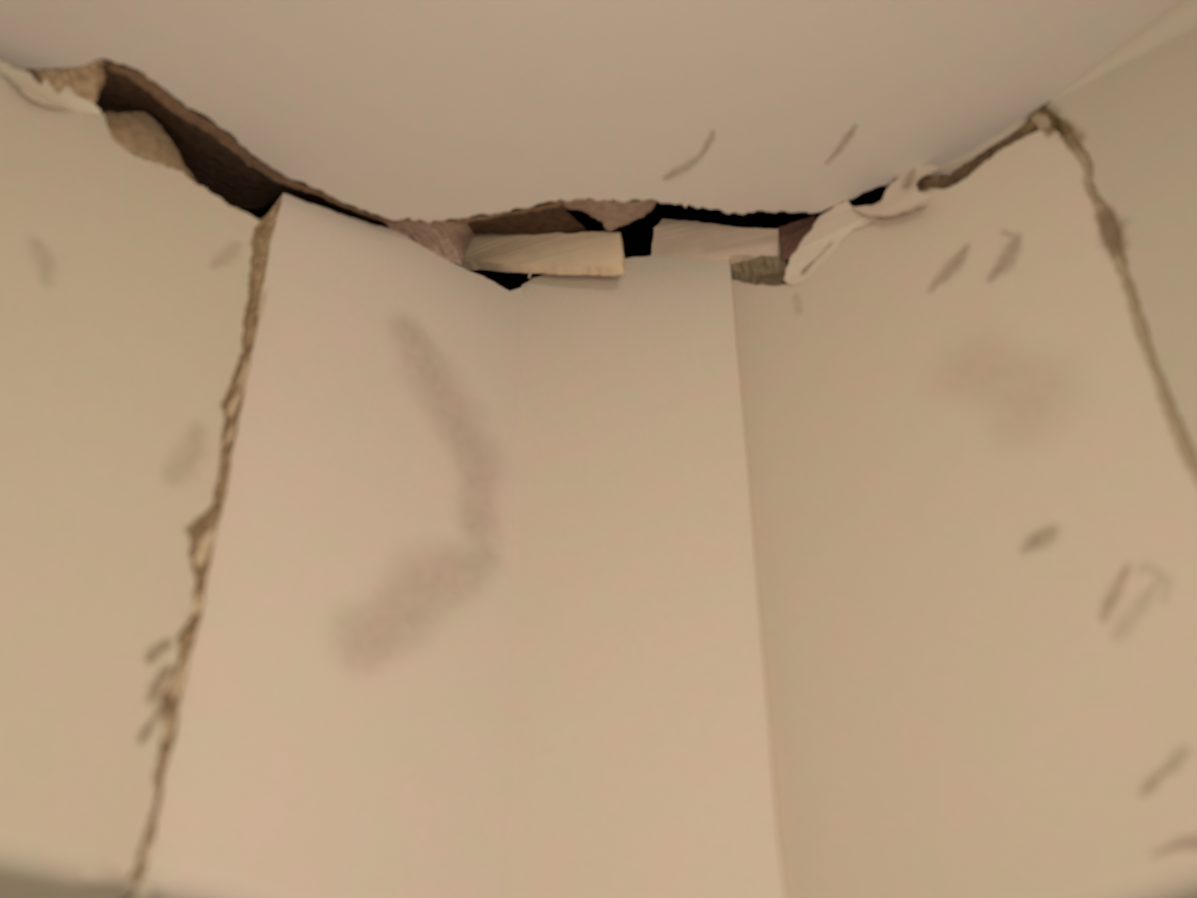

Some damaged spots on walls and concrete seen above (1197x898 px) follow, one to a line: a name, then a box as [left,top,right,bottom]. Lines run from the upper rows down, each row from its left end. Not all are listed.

crack [0,60,101,117]
flaking render [35,59,282,220]
flaking render [295,180,544,291]
spalling [502,165,947,286]
crack [916,119,1197,484]
crack [128,194,283,884]